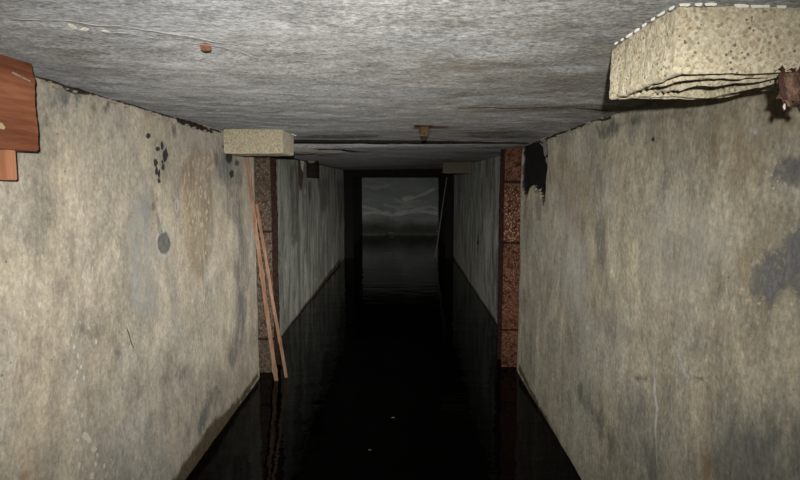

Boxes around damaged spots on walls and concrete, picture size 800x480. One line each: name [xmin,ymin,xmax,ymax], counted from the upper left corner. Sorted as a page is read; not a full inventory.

leakage [154,142,168,183]
spalling [522,139,548,222]
leakage [133,201,172,257]
leakage [737,229,800,307]